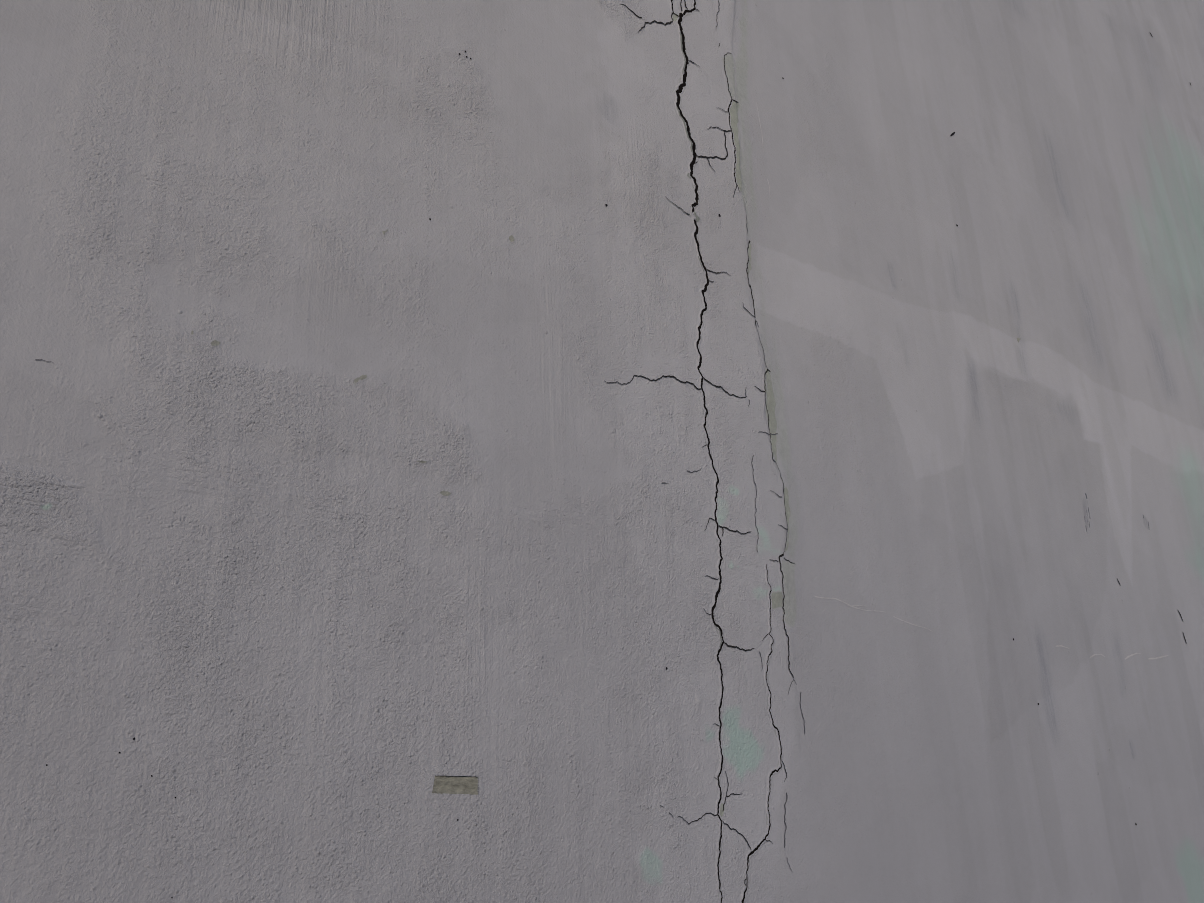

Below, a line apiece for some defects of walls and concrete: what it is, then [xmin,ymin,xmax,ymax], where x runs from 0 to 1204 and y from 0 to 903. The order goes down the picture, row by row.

flaking render [425,768,484,802]
crack [604,0,805,903]